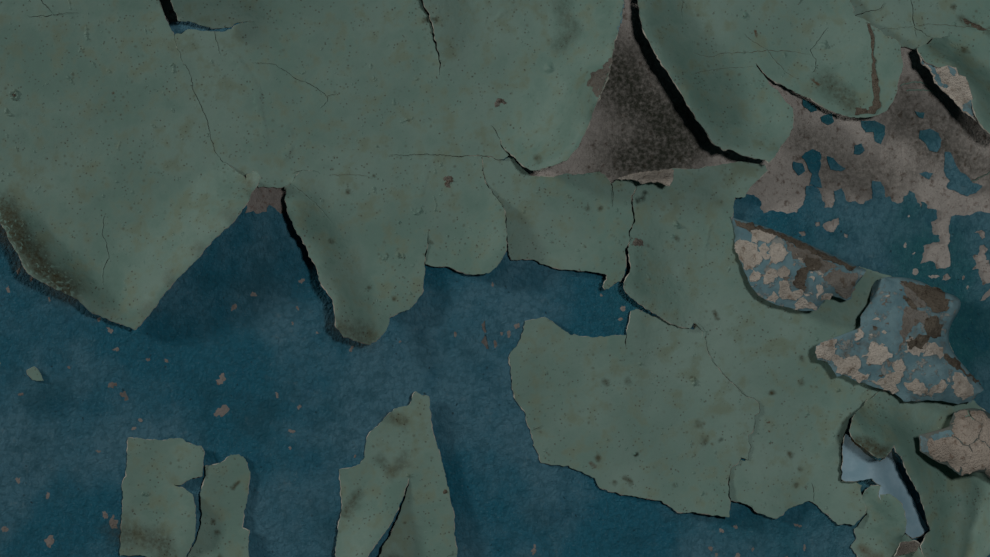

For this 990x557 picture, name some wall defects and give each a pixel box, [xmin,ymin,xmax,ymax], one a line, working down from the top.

crack [421,0,440,75]
peeling [0,0,670,345]
peeling [508,0,990,557]
peeling [26,366,44,381]
peeling [103,418,250,557]
spalling [214,405,229,417]
peeling [335,391,458,557]